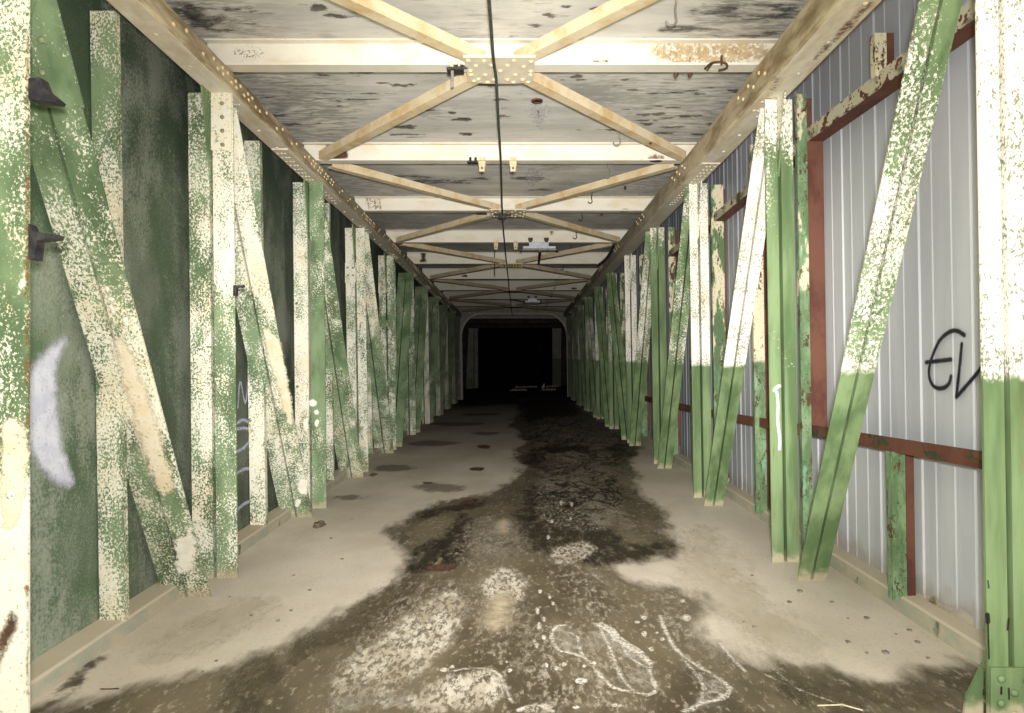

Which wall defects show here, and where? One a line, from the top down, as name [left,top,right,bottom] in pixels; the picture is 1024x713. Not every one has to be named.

rust [814,2,872,60]
peeling [105,286,174,496]
peeling [173,526,197,574]
leakage [30,397,986,713]